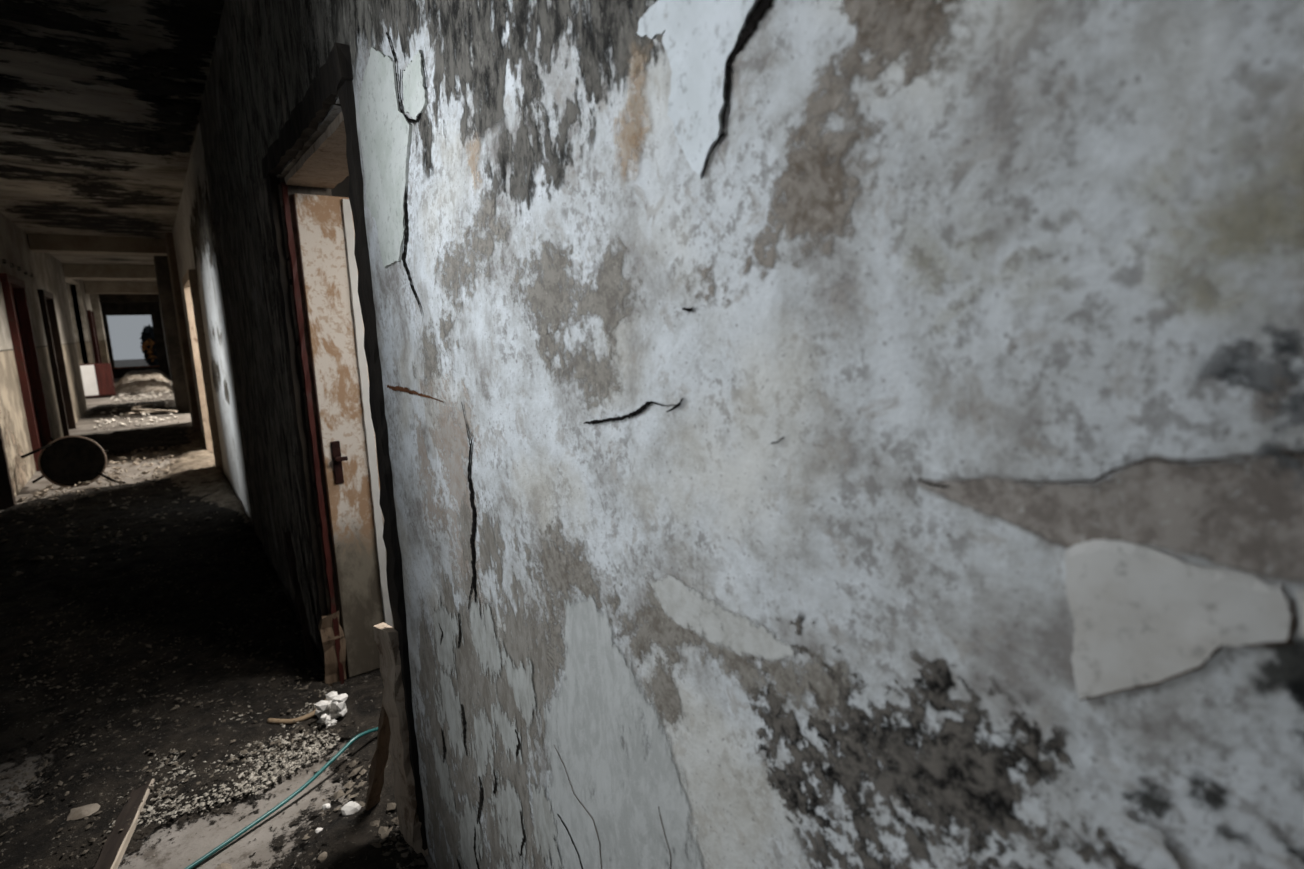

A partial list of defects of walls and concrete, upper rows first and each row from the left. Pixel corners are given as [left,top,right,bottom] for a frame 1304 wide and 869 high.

water stain [0,0,224,239]
crack [386,32,426,123]
peeling [636,0,759,179]
crack [701,0,770,180]
crack [402,190,422,314]
crack [583,398,683,425]
spalling [918,453,1304,699]
water stain [523,520,1188,869]